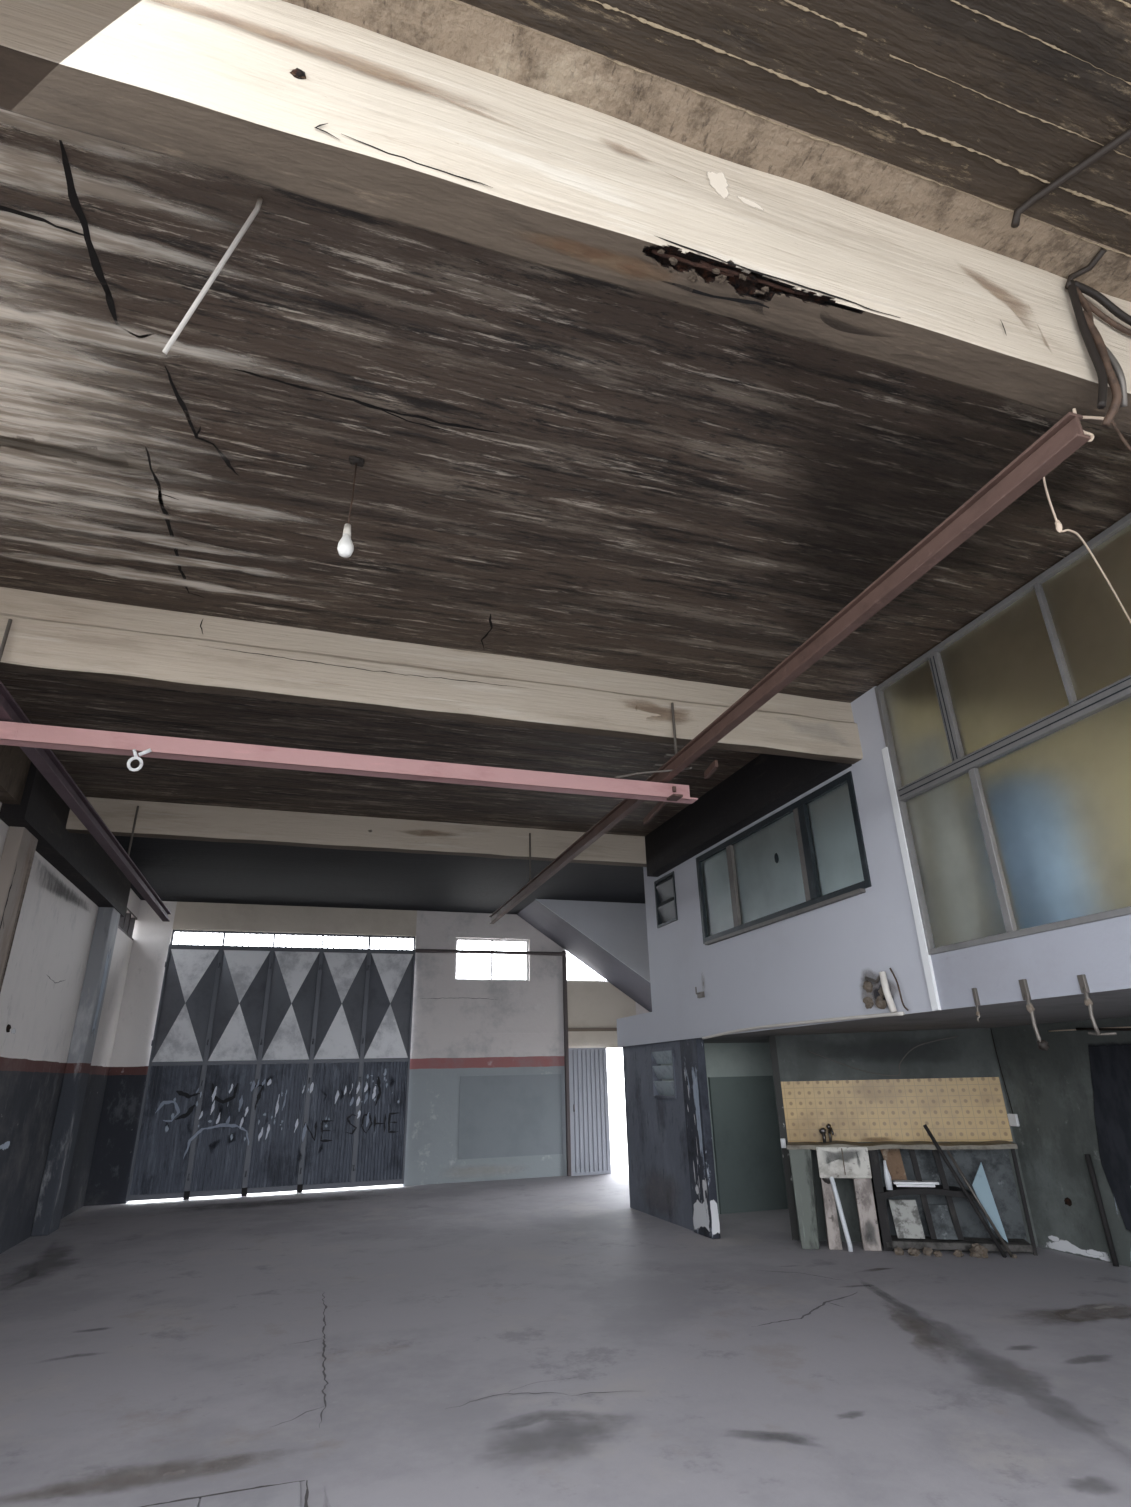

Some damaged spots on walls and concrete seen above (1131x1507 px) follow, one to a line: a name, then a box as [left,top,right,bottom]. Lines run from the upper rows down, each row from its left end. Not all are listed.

crack [0,140,241,476]
spalling [642,236,900,321]
crack [234,369,499,433]
crack [145,447,523,688]
crack [272,1292,328,1428]
crack [751,1270,857,1327]